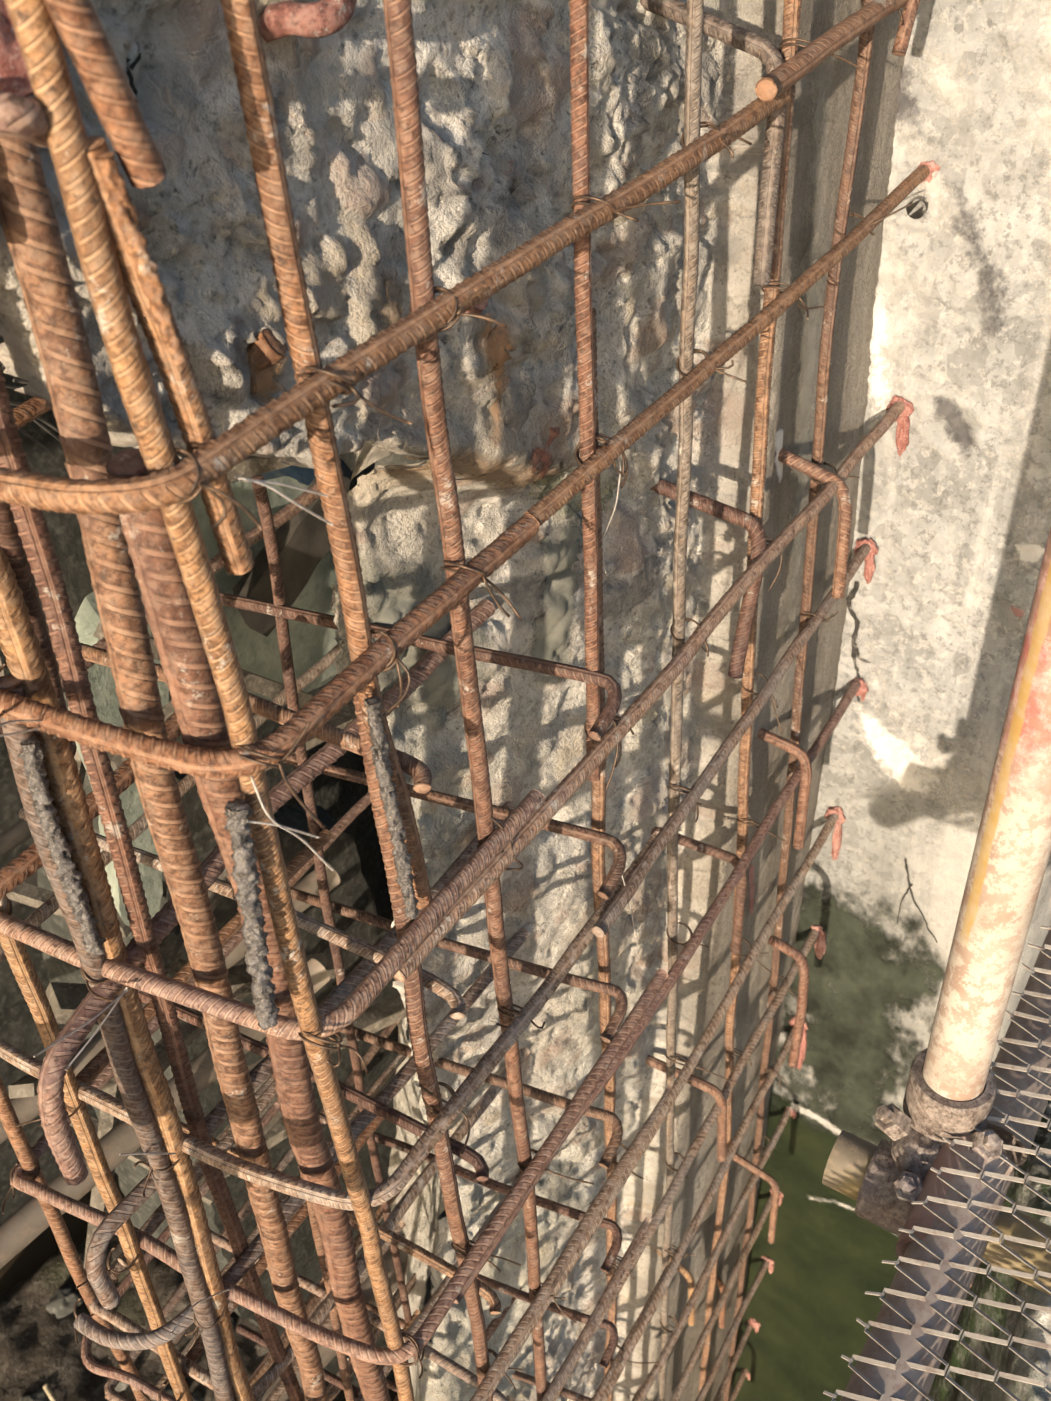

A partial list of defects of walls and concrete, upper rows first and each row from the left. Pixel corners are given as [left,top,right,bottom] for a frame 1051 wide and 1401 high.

rust [479,315,514,442]
spalling [383,455,432,477]
spalling [453,452,563,492]
crack [846,582,874,704]